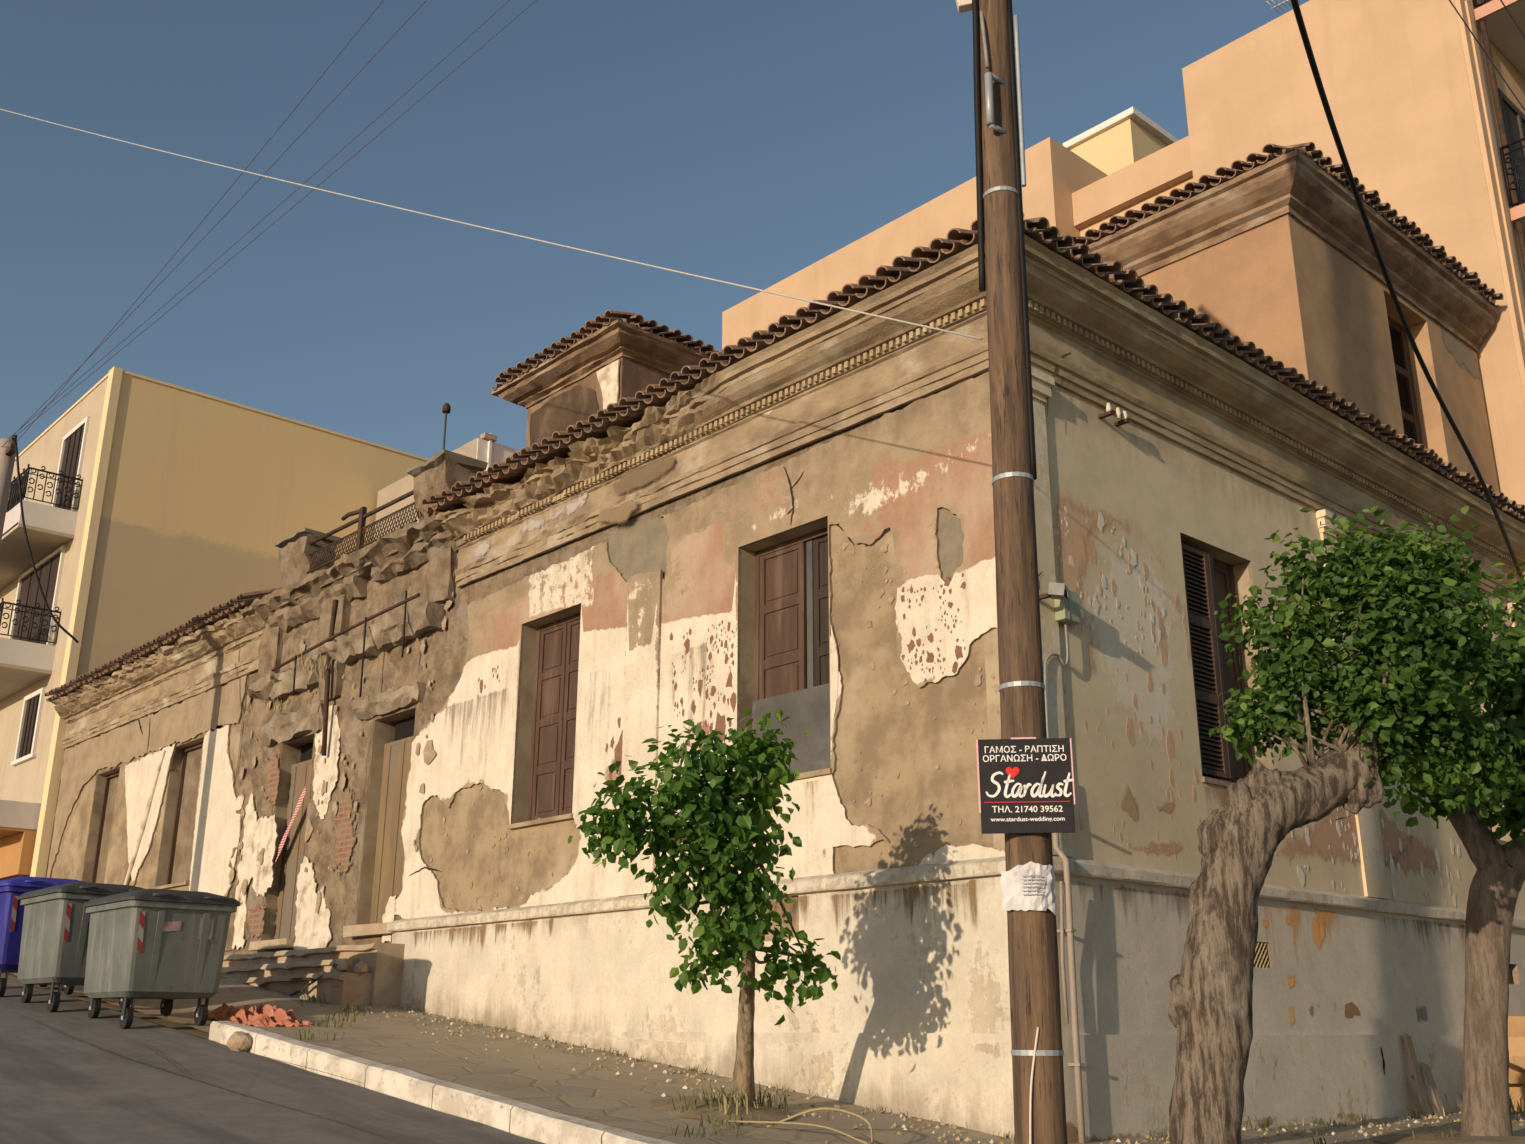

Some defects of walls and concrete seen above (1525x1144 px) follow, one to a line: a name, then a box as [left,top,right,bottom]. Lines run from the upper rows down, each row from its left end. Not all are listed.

spalling [521,456,675,582]
crack [784,467,804,525]
spalling [225,541,500,953]
peeling [670,620,736,759]
spalling [831,508,1000,874]
peeling [1055,497,1199,858]
spalling [51,774,97,881]
spalling [104,760,190,891]
spalling [382,783,579,943]